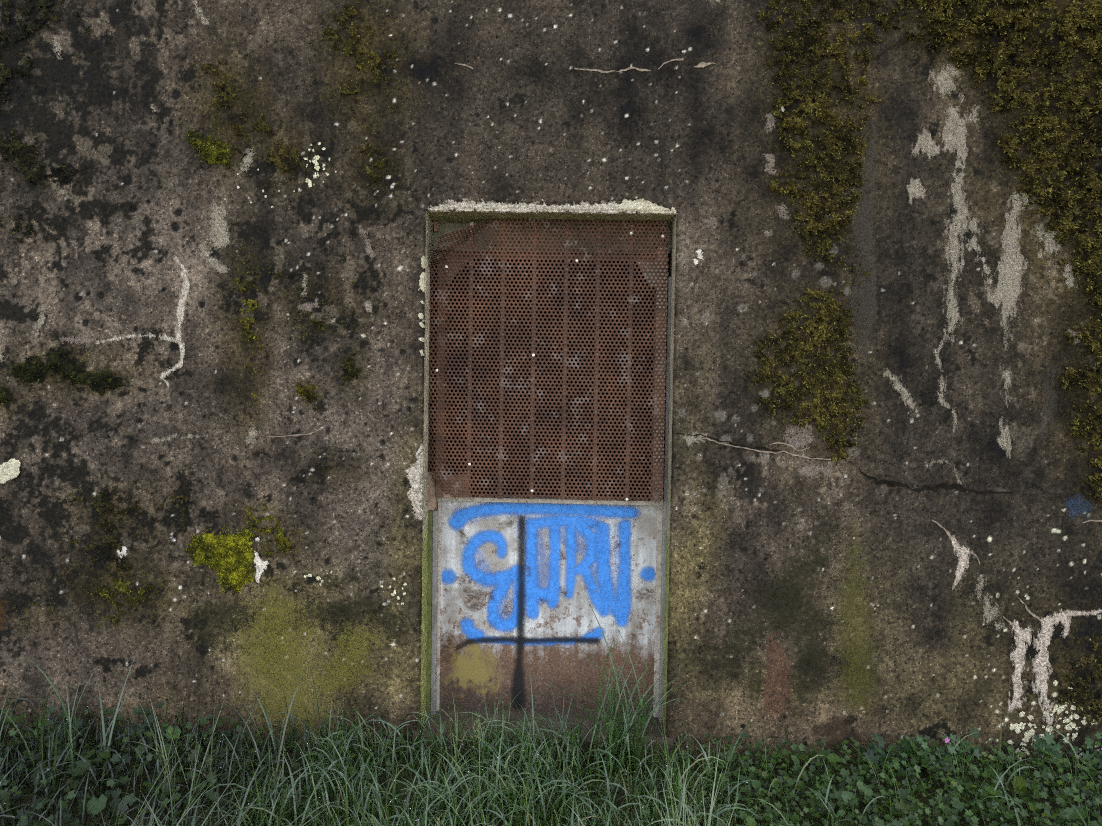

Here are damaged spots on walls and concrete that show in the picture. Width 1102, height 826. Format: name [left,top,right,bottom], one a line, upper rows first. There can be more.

leakage [906,178,929,204]
leakage [912,64,1061,405]
crack [96,255,190,387]
leakage [883,368,919,413]
crack [934,342,958,432]
spalling [0,458,21,484]
crack [676,433,1013,494]
leakage [997,418,1011,458]
crack [932,520,980,589]
leakage [974,578,1005,633]